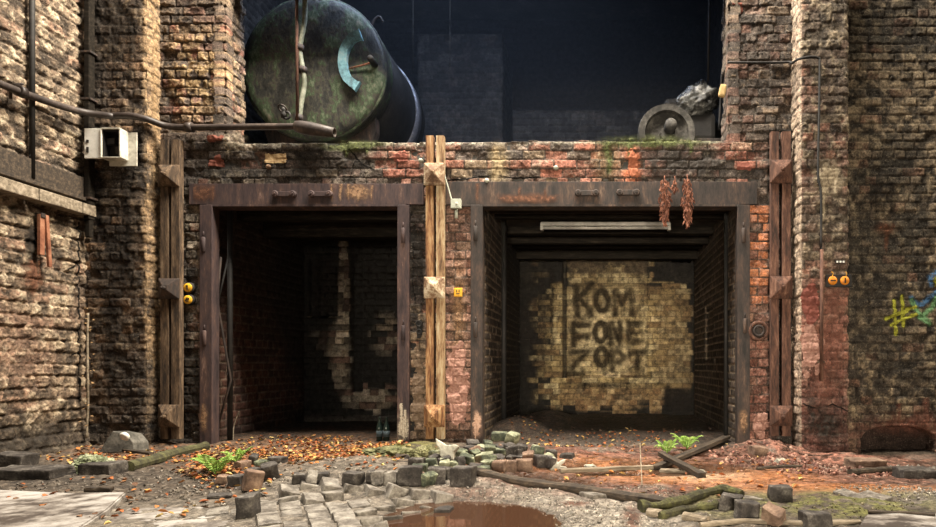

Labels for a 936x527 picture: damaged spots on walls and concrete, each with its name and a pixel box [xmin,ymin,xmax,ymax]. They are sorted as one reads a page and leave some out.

corrosion [331,184,373,199]
corrosion [500,188,555,202]
peeling [800,283,825,379]